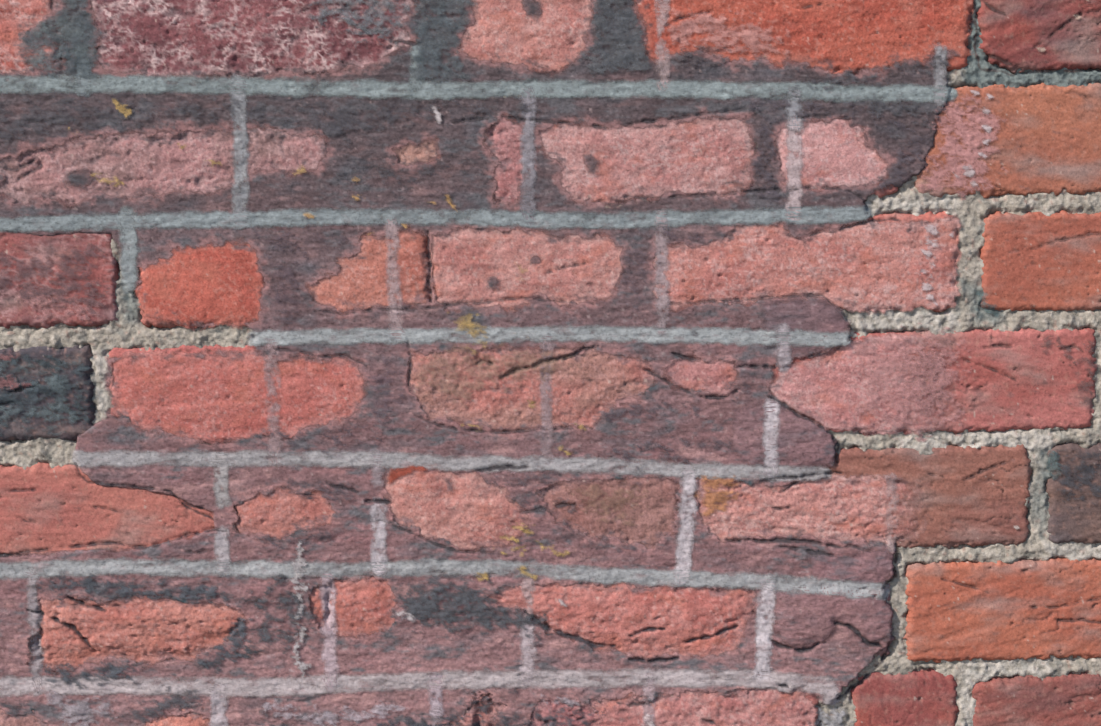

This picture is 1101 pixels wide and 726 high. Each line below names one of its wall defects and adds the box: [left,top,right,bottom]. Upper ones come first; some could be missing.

spalling [90,0,414,79]
spalling [458,0,594,72]
spalling [633,0,974,75]
spalling [0,126,327,205]
spalling [539,117,755,204]
spalling [134,242,265,329]
spalling [309,226,623,313]
spalling [653,215,961,313]
spalling [407,345,737,432]
spalling [693,474,916,545]
spalling [27,595,248,674]
spalling [486,582,756,658]